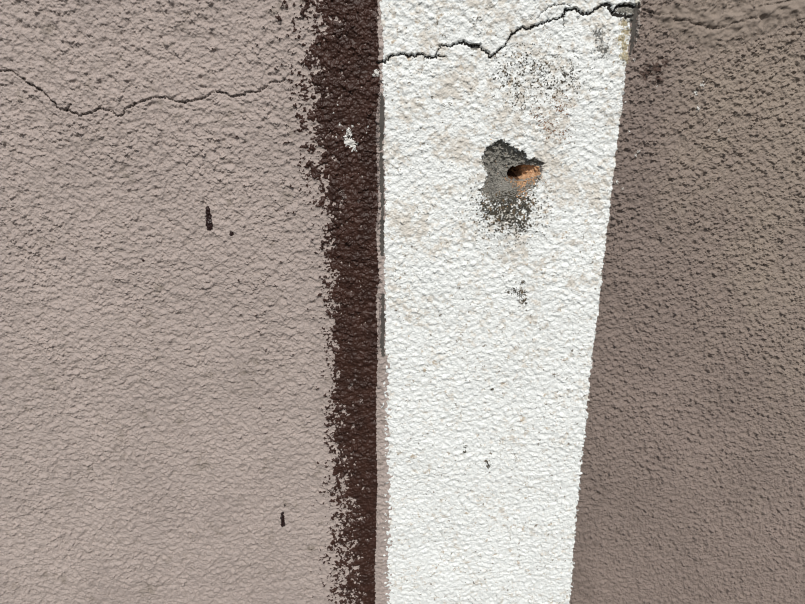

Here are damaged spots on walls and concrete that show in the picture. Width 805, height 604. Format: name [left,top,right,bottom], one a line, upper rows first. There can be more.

crack [311,2,752,79]
crack [0,70,282,117]
spalling [477,140,544,203]